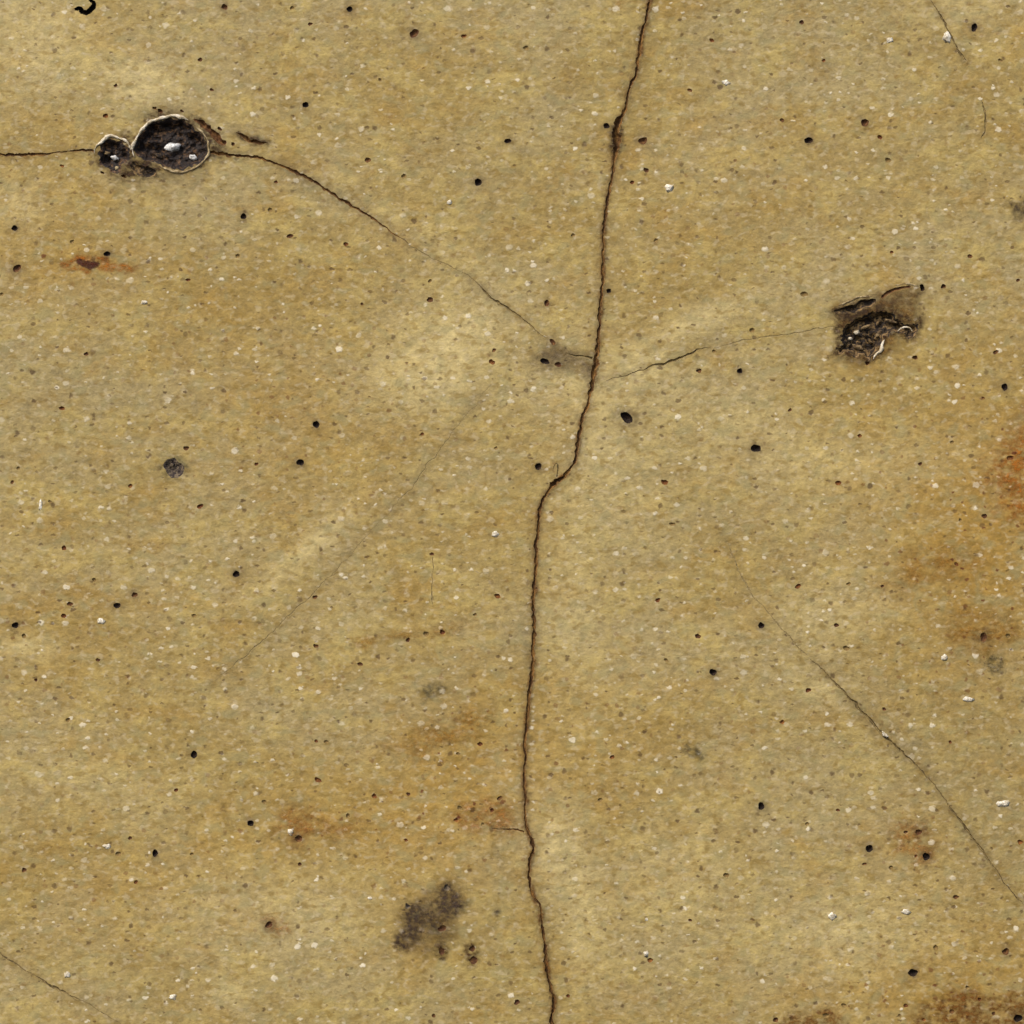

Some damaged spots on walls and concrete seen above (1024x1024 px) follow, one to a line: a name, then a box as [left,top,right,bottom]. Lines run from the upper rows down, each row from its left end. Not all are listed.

crack [0,148,94,157]
spalling [94,107,235,178]
rust [61,256,132,273]
spalling [832,283,925,365]
crack [210,0,835,1024]
crack [722,532,1024,905]
damp [394,883,463,960]
crack [0,953,121,1024]